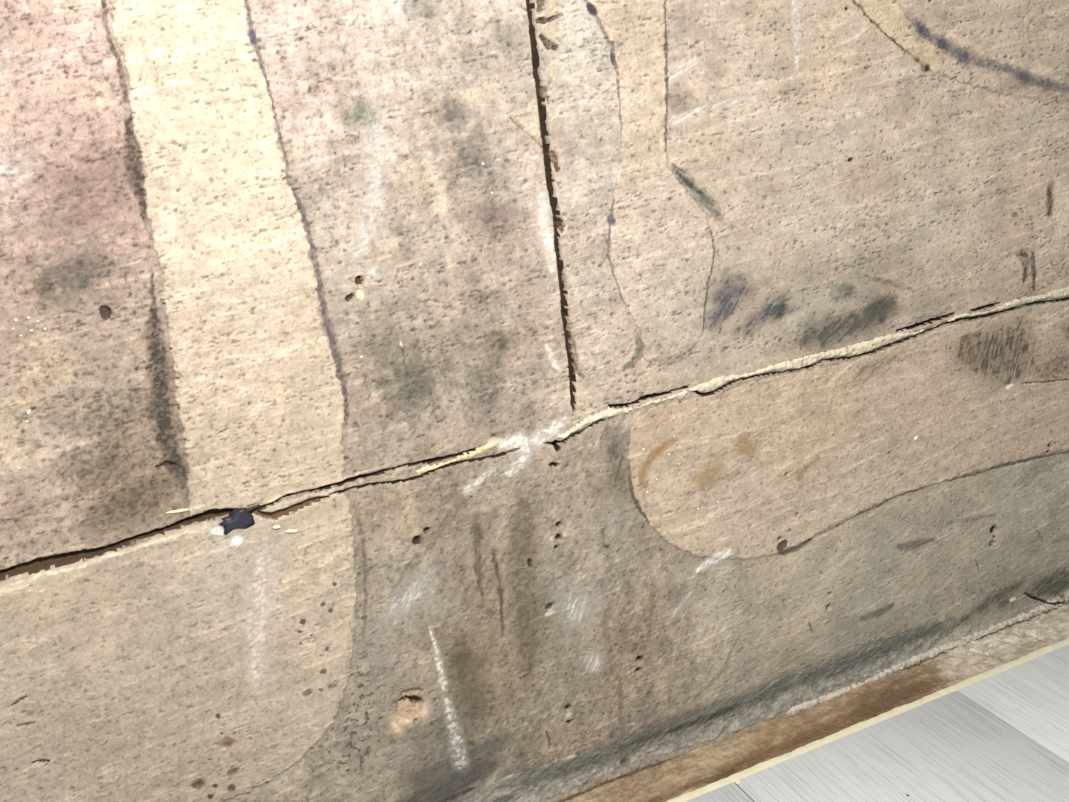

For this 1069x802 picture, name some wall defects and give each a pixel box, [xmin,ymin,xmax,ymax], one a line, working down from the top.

crack [506,0,1069,451]
crack [0,448,519,582]